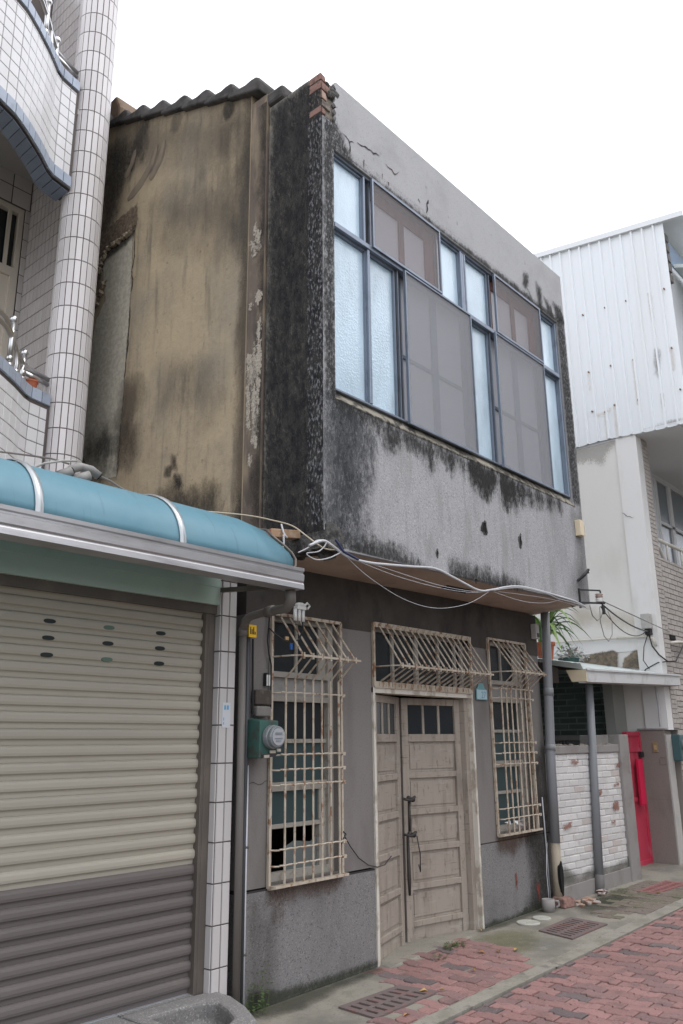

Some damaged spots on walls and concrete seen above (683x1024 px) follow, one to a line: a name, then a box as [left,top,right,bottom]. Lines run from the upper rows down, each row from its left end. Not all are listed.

leakage [101,120,149,231]
crack [345,135,399,185]
peeling [249,222,262,258]
leakage [237,80,580,566]
peeling [245,289,263,467]
leakage [165,457,215,511]
leakage [449,561,521,591]